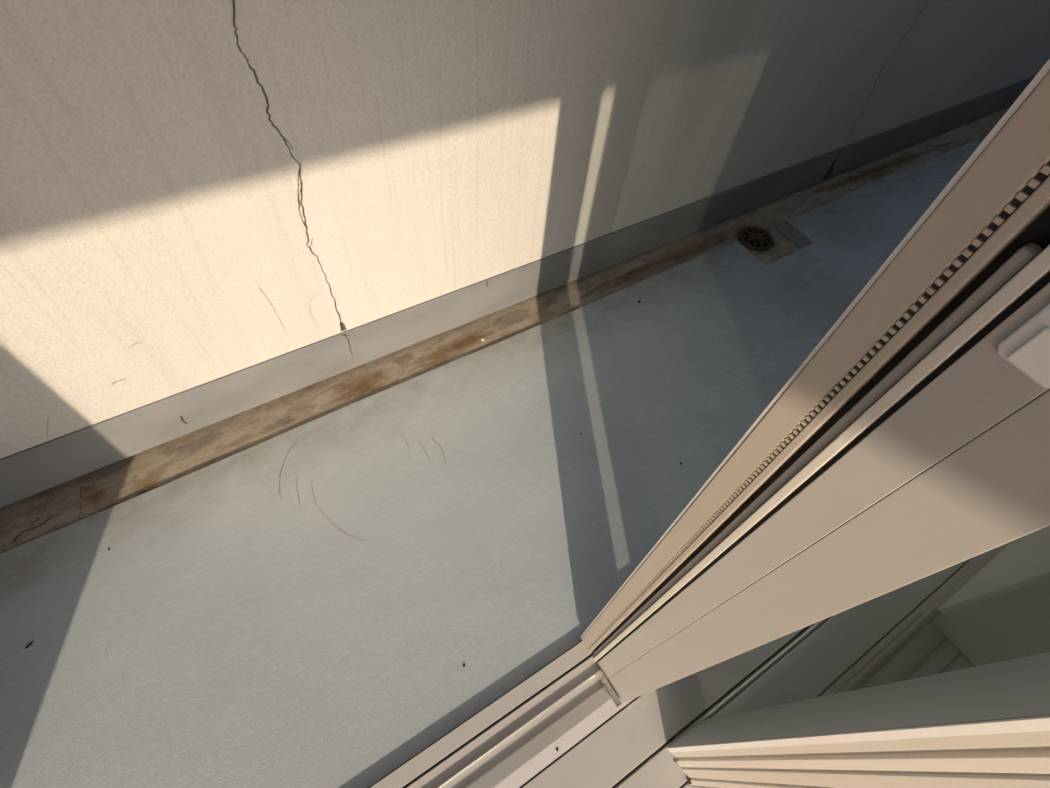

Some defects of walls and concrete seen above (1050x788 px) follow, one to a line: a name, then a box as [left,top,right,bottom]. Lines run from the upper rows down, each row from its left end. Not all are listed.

crack [233,0,352,353]